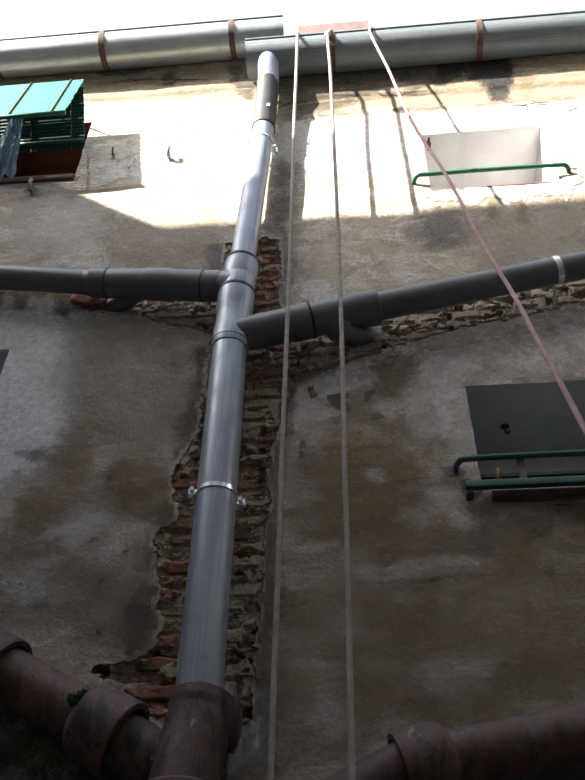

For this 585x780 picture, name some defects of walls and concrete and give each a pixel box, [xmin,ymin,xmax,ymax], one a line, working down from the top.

flaking render [252,238,282,315]
leakage [277,52,585,120]
peeling [424,160,583,207]
leakage [0,423,173,648]
flaking render [70,294,217,722]
flaking render [223,279,585,726]
leakage [243,396,585,770]